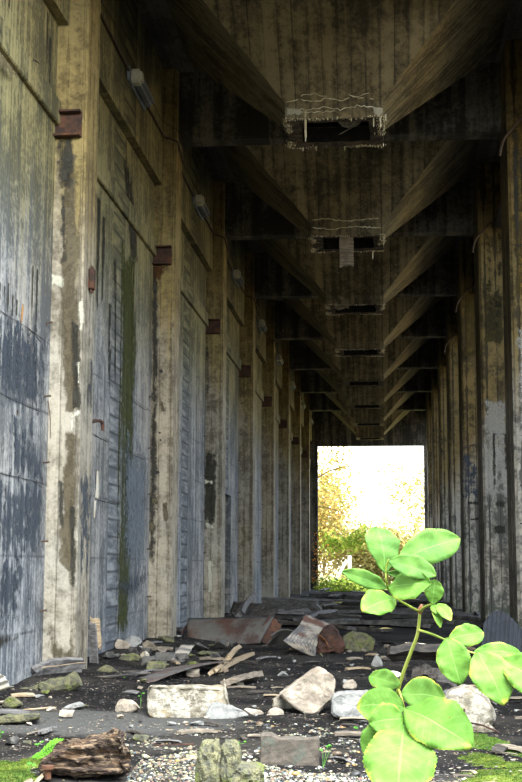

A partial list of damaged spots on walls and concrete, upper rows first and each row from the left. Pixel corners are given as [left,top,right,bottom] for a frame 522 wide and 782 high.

damp [0,266,46,647]
damp [59,155,93,586]
damp [124,159,134,206]
damp [97,198,169,601]
damp [282,106,387,151]